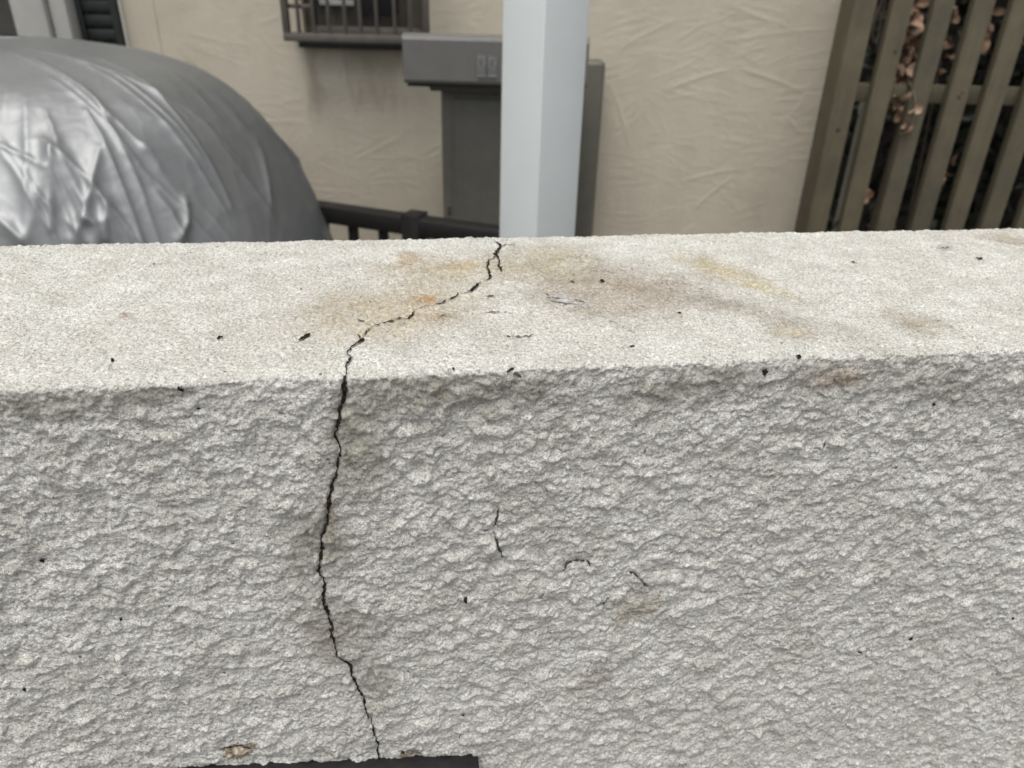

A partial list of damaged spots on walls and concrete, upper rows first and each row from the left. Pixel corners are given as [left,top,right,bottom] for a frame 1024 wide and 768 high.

crack [316,240,533,759]